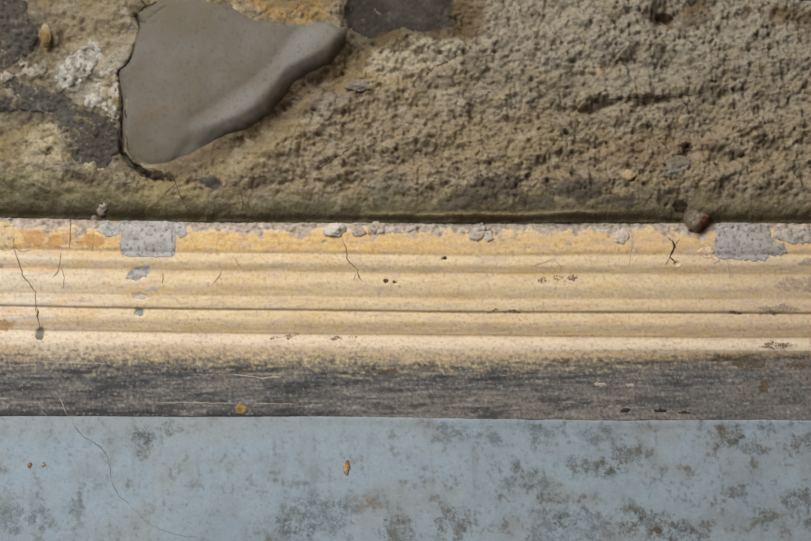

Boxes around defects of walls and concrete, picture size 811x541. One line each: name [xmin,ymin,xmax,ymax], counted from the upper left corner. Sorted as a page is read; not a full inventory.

crack [13,239,40,326]
crack [53,219,71,289]
peeling [174,222,187,238]
peeling [755,238,788,257]
crack [73,423,201,541]